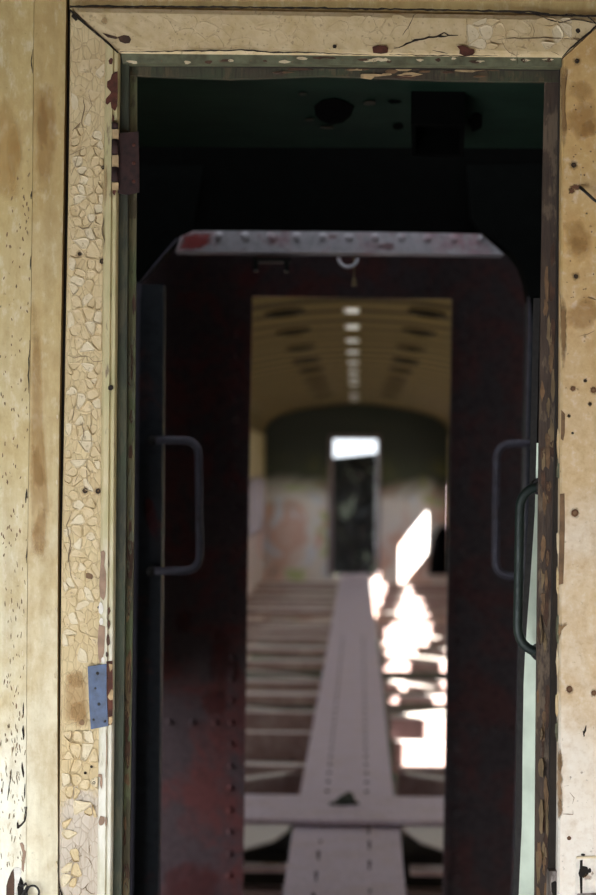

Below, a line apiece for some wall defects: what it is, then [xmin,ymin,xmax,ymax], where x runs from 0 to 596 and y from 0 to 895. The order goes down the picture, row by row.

peeling [161,15,410,64]
crack [69,5,596,63]
peeling [452,17,572,64]
crack [70,96,92,175]
peeling [67,59,105,352]
crack [72,405,92,482]
crack [65,512,73,578]
peeling [55,363,111,663]
peeling [55,720,107,888]